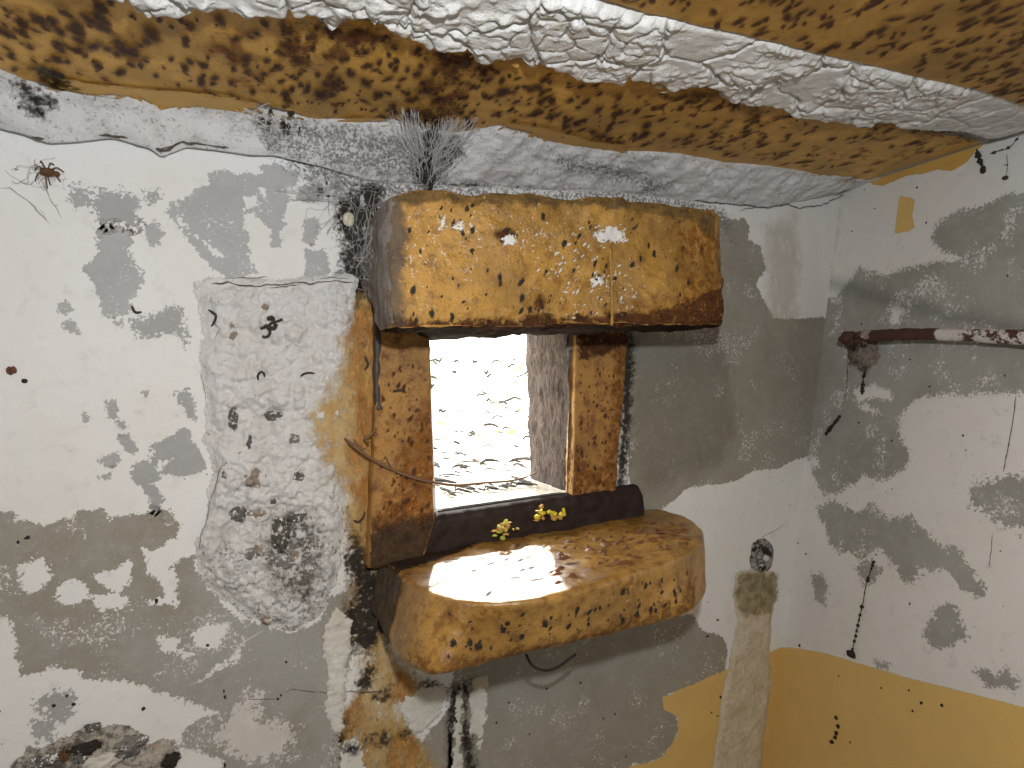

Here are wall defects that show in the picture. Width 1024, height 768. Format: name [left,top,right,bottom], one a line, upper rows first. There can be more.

peeling [26,76,304,120]
peeling [498,121,627,154]
spalling [116,0,1024,139]
spalling [0,162,728,768]
corrosion [310,299,695,768]
corrosion [386,190,724,495]
peeling [623,192,1024,599]
water stain [344,522,395,702]
water stain [343,731,411,755]
water stain [420,678,477,768]
peeling [921,601,970,651]
peeling [971,664,1022,695]